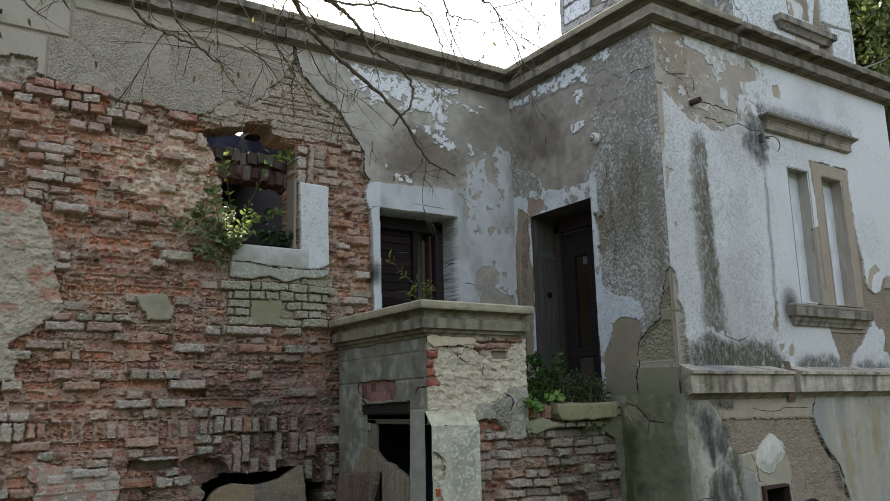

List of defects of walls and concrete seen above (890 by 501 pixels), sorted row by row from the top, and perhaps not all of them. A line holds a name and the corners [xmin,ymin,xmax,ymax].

peeling [330,56,485,151]
peeling [651,27,756,154]
spalling [0,53,219,306]
spalling [328,175,375,317]
peeling [423,47,611,420]
crack [636,267,669,429]
leakage [690,135,726,336]
flaking render [818,229,890,367]
spalling [0,379,113,501]
spalling [480,445,518,501]
leakage [693,407,736,501]
flaking render [722,417,851,501]